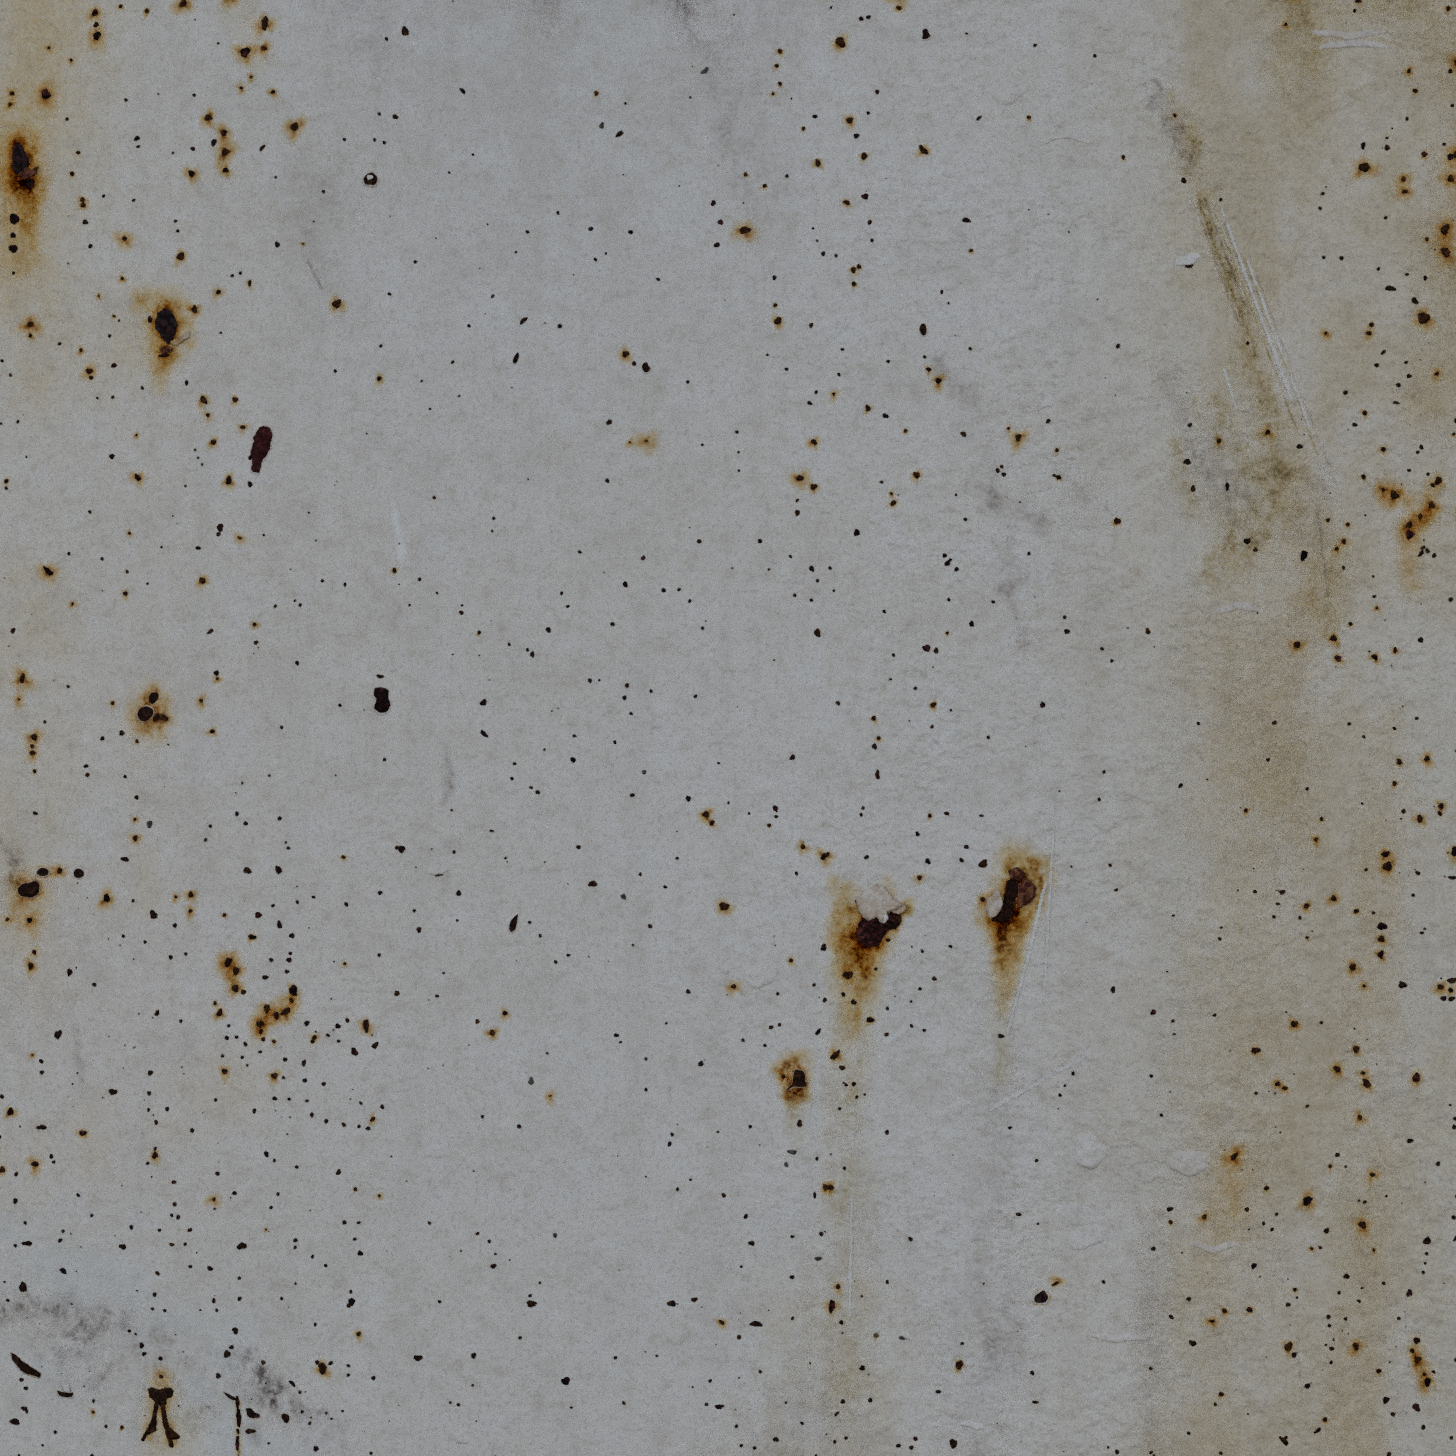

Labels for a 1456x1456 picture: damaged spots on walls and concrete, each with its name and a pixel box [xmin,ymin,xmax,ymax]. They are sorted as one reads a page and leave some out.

rust [1343,219,1454,430]
rust [0,774,384,1456]
rust [774,935,952,1111]